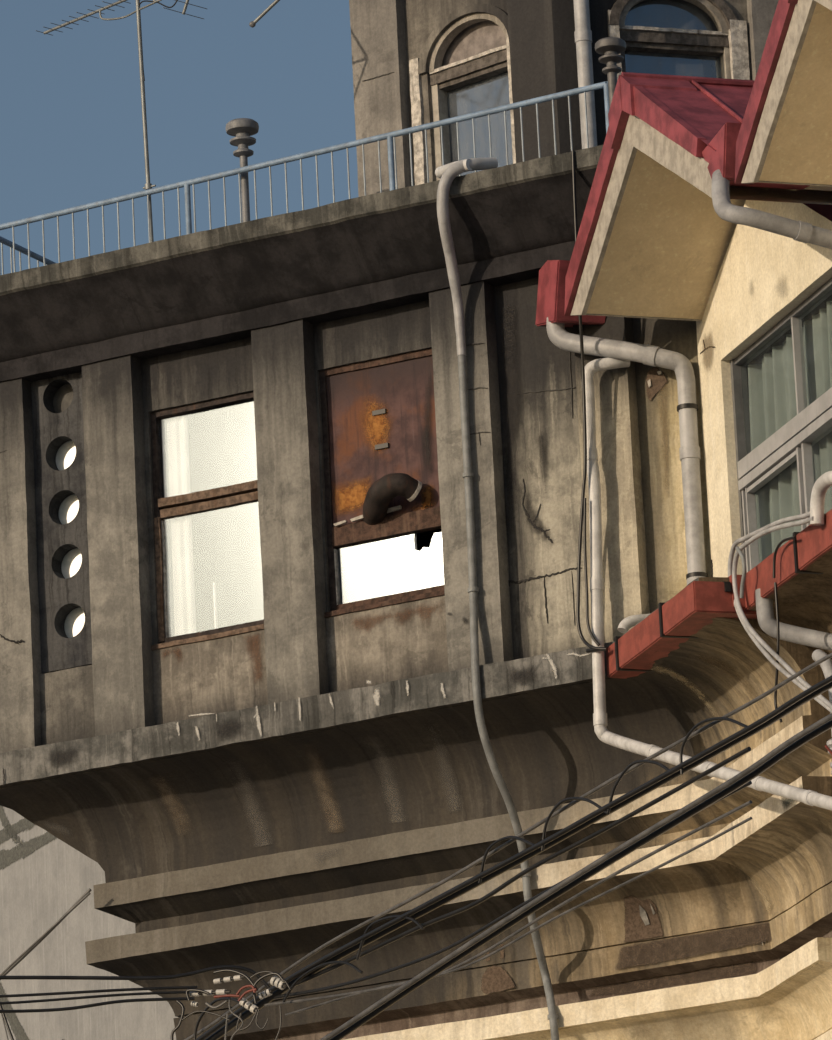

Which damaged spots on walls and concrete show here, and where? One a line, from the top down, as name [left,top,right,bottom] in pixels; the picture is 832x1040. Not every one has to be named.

corrosion [367,405,388,445]
corrosion [338,483,368,511]
crack [522,479,553,543]
crack [509,568,577,624]